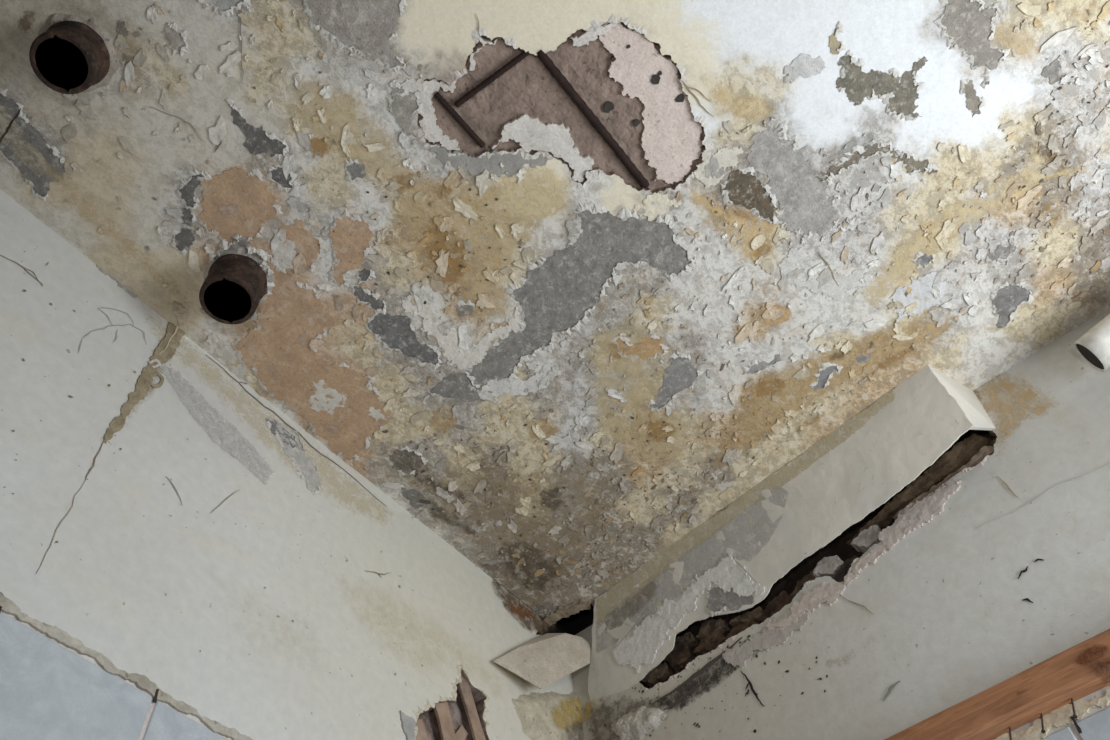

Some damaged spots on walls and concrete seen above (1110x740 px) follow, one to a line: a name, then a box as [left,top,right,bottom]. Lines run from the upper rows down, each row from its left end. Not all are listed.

peeling [0,88,104,202]
leakage [294,82,567,326]
spalling [115,0,1110,588]
leakage [867,135,1084,305]
leakage [399,448,646,634]
flaking render [493,487,787,689]
leakage [552,632,789,740]
crack [655,637,764,710]
leakage [597,391,895,621]
spalling [639,430,997,693]